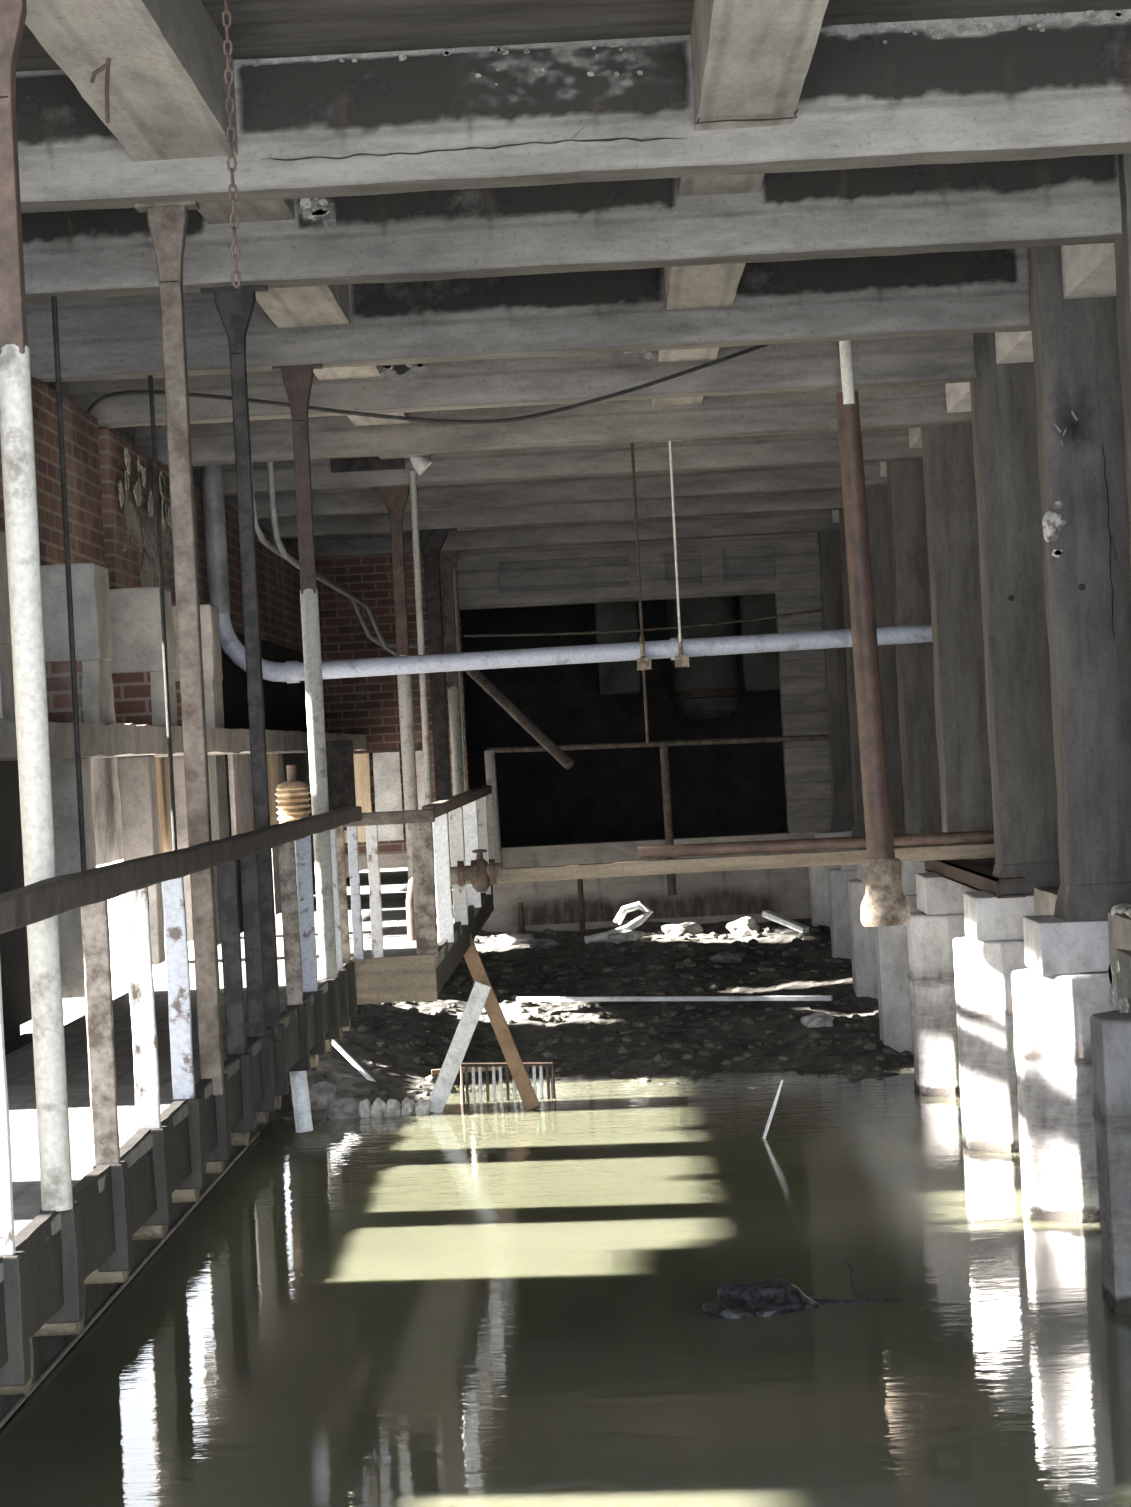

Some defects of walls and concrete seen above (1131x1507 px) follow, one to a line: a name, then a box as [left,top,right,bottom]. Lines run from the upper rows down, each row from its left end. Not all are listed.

peeling [252,38,665,86]